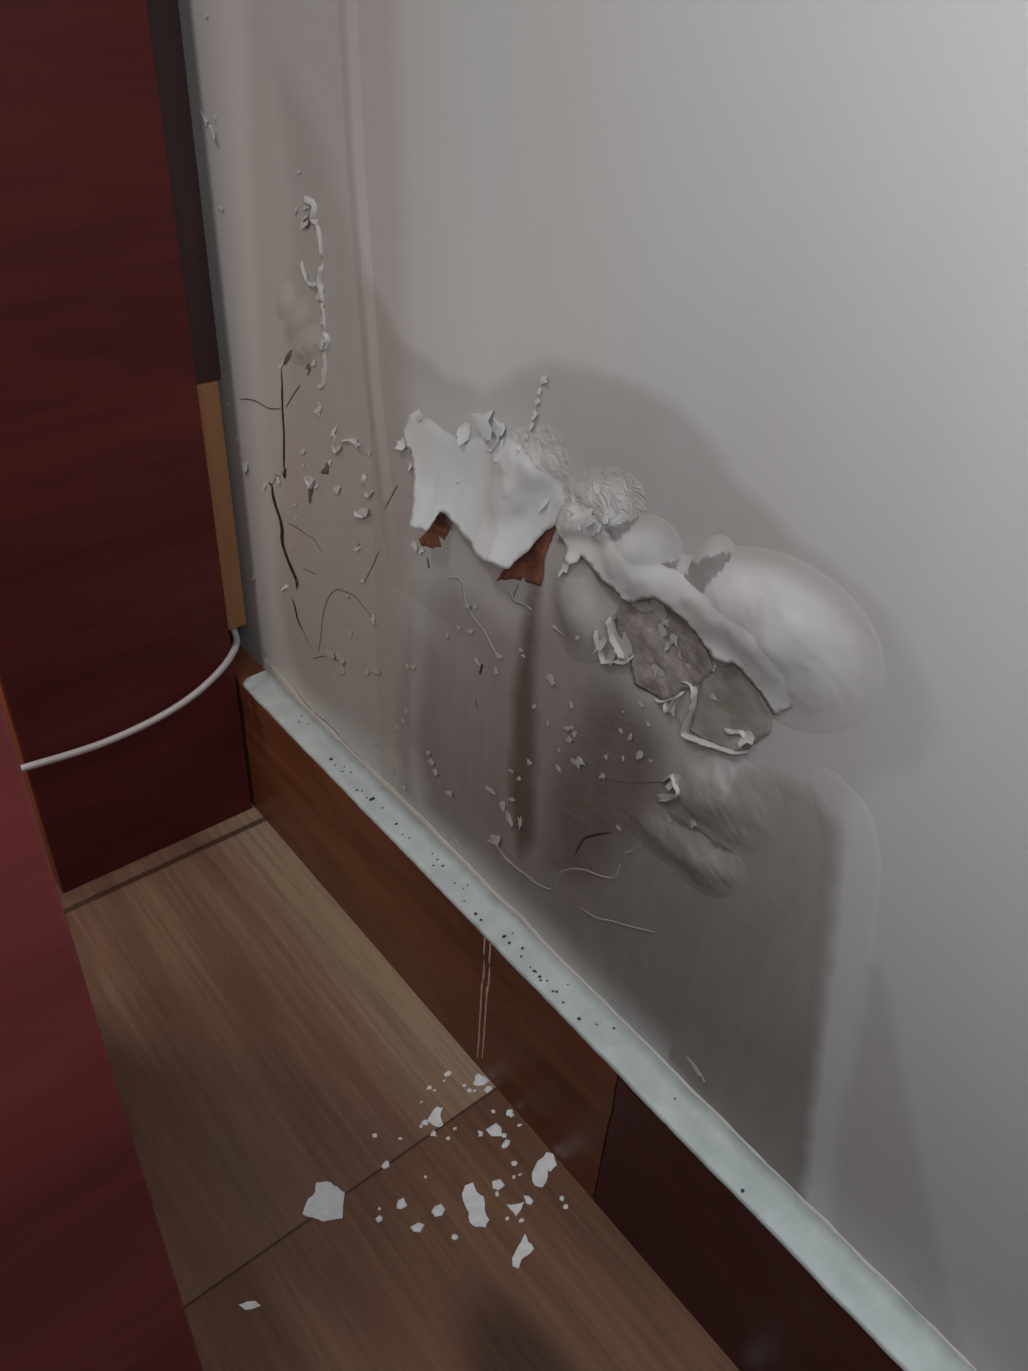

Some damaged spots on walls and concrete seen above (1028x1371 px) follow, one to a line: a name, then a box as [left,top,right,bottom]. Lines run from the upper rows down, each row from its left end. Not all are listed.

peeling [294,195,330,416]
crack [239,371,379,768]
peeling [294,426,374,520]
peeling [394,375,793,779]
peeling [485,786,522,846]
spalling [657,774,683,802]